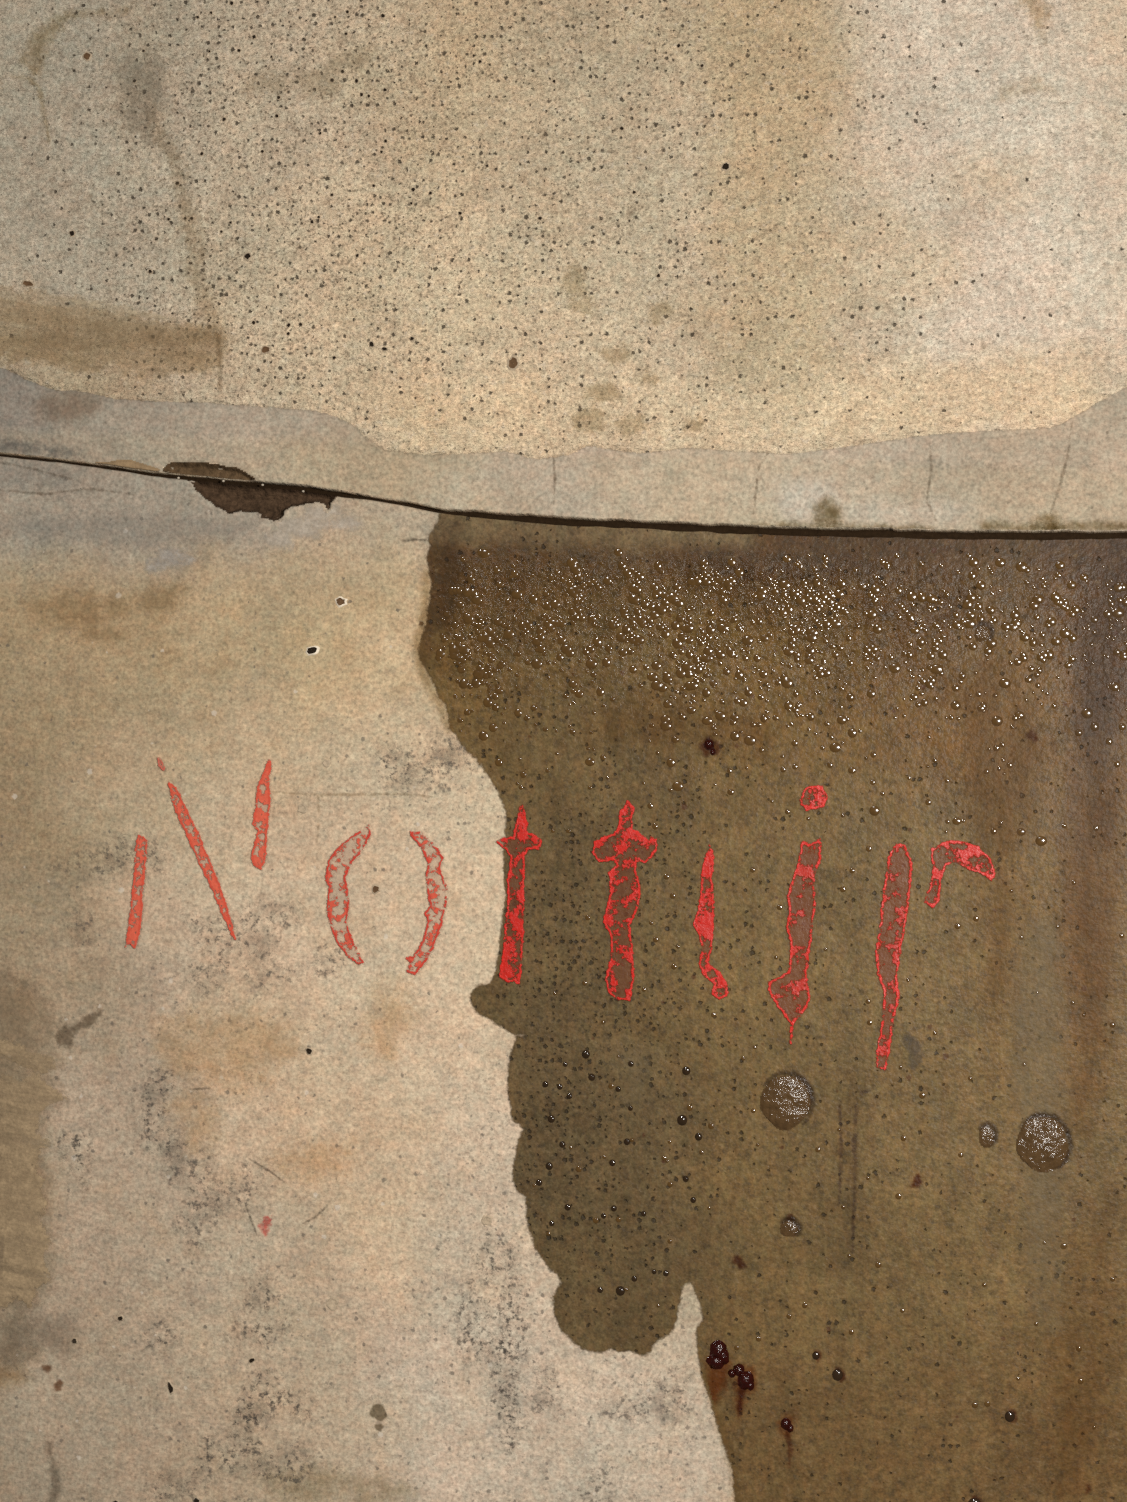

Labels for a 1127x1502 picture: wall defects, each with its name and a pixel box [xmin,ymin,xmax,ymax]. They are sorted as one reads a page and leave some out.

spalling [95,460,337,521]
crack [0,455,1127,540]
leakage [383,513,1127,1502]
corrosion [706,1340,754,1391]
corrosion [781,1418,794,1433]